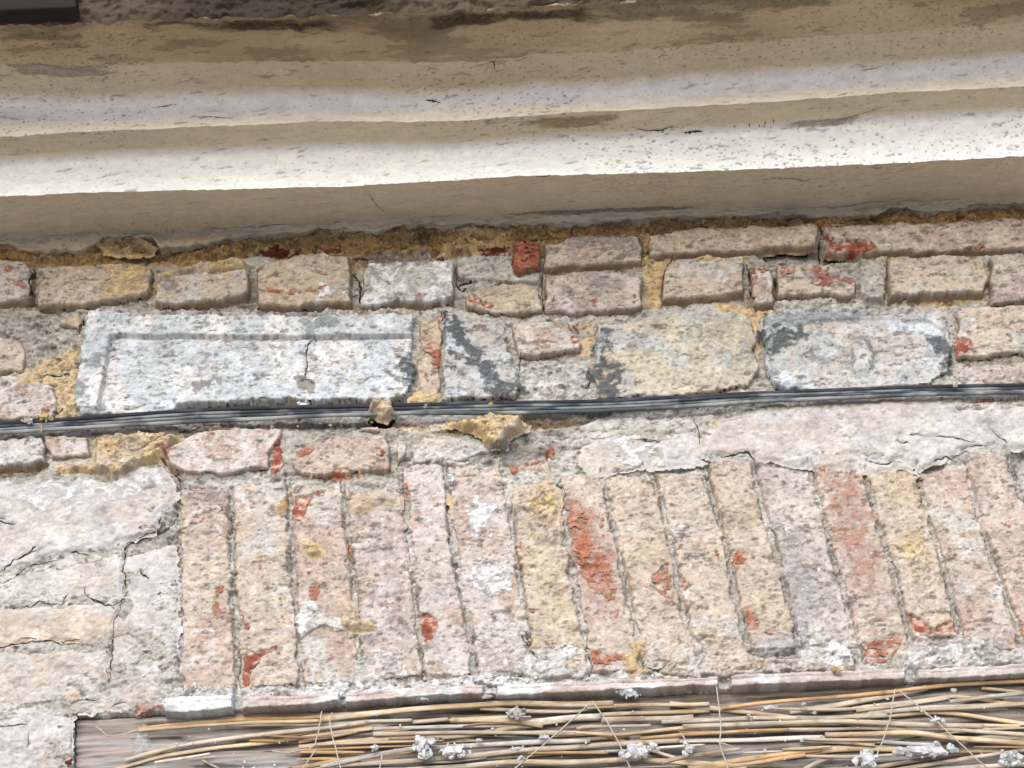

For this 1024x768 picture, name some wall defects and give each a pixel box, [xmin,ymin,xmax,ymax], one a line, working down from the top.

spalling [256,244,374,272]
spalling [750,232,875,287]
crack [302,341,315,385]
spalling [270,436,285,474]
crack [692,416,755,463]
crack [866,433,1007,481]
spalling [291,467,364,522]
spalling [567,499,619,618]
crack [0,514,178,707]
spalling [417,613,439,644]
spalling [861,611,956,664]
spalling [242,645,278,687]